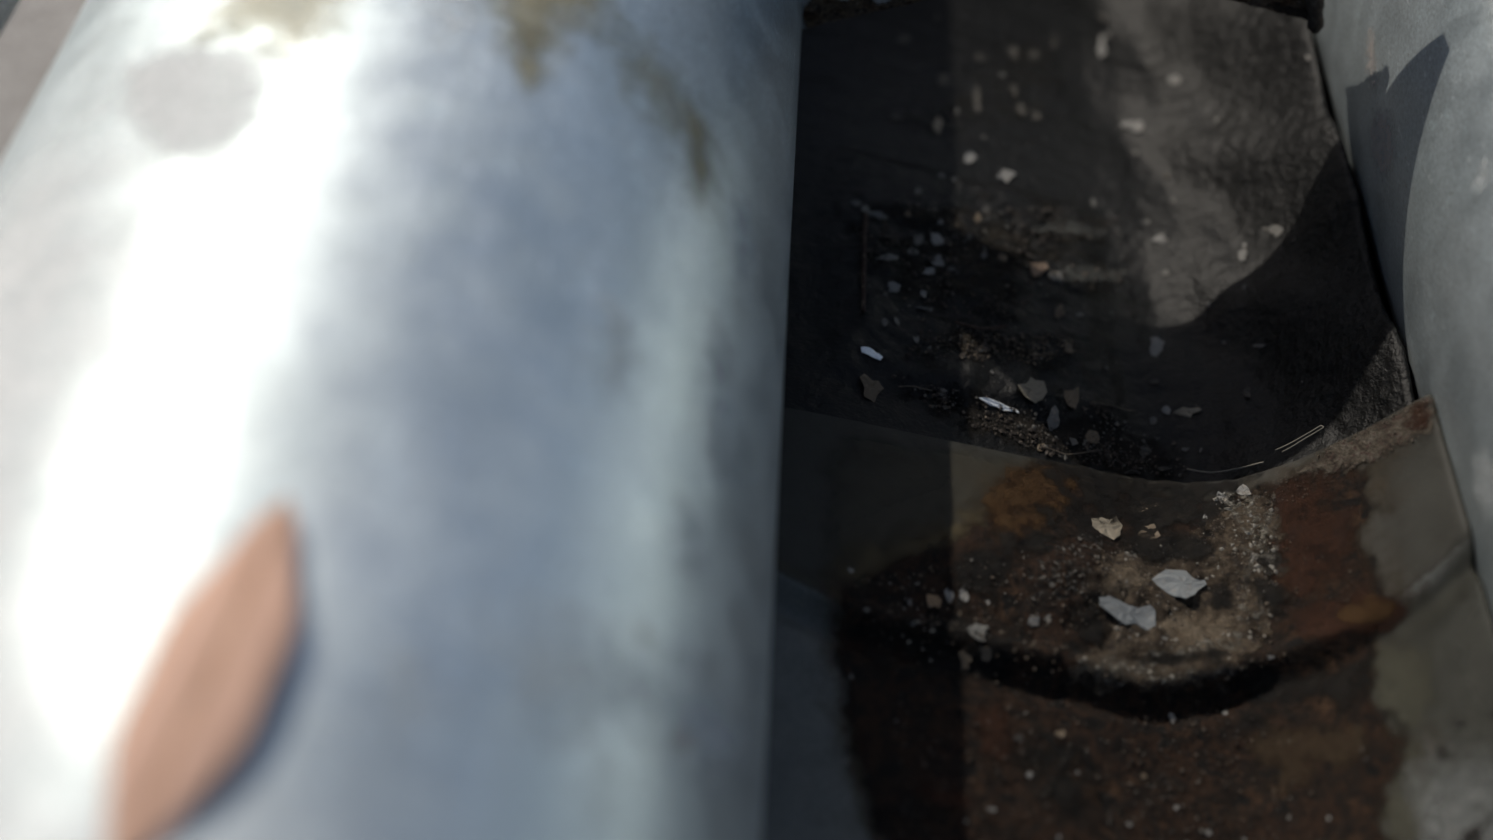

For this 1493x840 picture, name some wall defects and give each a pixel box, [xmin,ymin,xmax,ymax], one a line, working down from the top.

rust [802,0,924,28]
rust [1232,0,1324,20]
rust [833,461,1407,840]